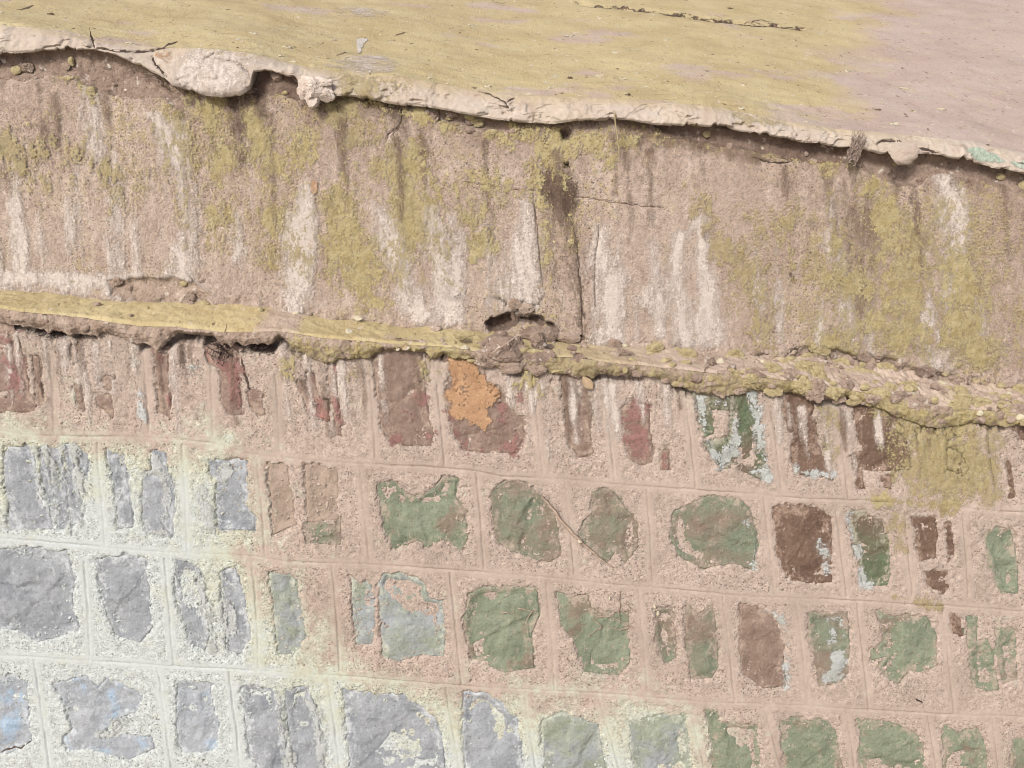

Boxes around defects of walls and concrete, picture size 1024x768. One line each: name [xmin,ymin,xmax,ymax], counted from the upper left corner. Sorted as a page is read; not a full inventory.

crack [575,2,811,31]
damp [0,86,143,300]
spalling [0,48,184,112]
spalling [246,70,306,101]
efflorescence [281,180,319,313]
damp [371,198,467,326]
spalling [423,107,515,140]
damp [486,200,542,314]
spalling [485,310,556,333]
crack [572,223,596,333]
damp [572,215,726,349]
spalling [654,125,1024,189]